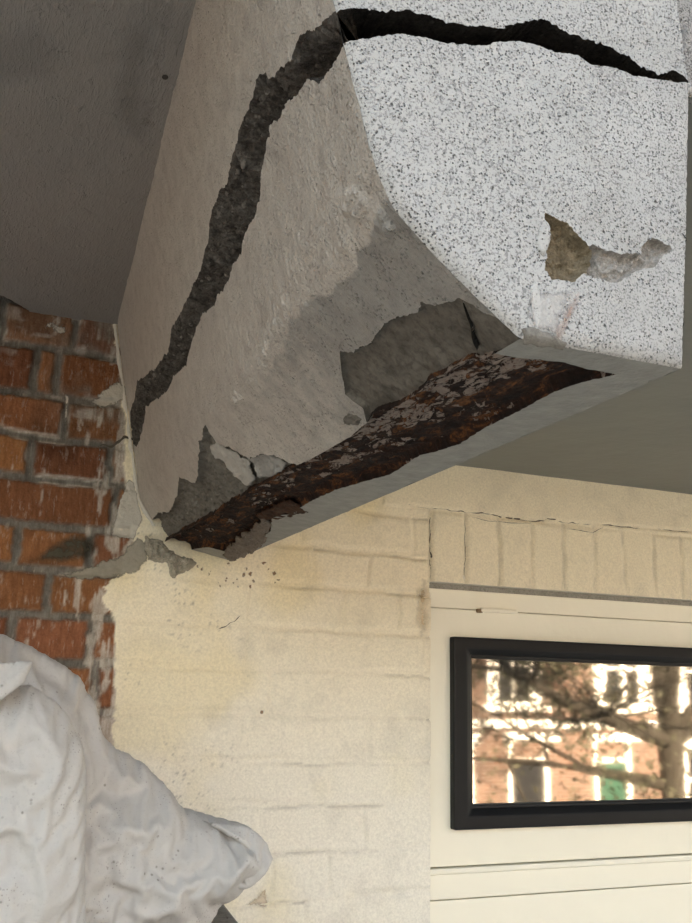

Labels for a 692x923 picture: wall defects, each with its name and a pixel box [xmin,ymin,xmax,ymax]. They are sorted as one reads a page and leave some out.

peeling [92,383,126,408]
spalling [112,425,291,578]
corrosion [165,348,615,564]
crack [98,8,688,448]
spalling [340,212,672,425]
crack [409,504,685,577]